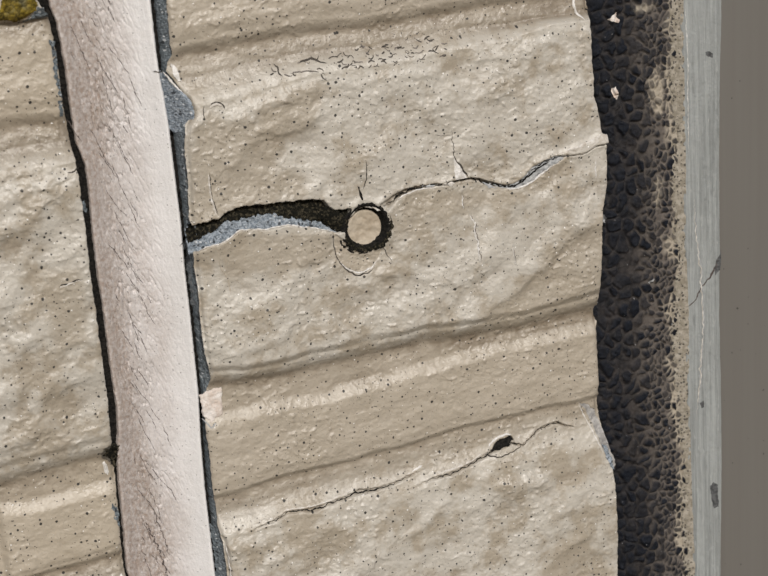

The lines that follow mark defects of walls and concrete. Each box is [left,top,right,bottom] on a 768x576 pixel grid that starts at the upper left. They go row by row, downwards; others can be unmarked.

crack [270,36,447,80]
crack [170,129,609,571]